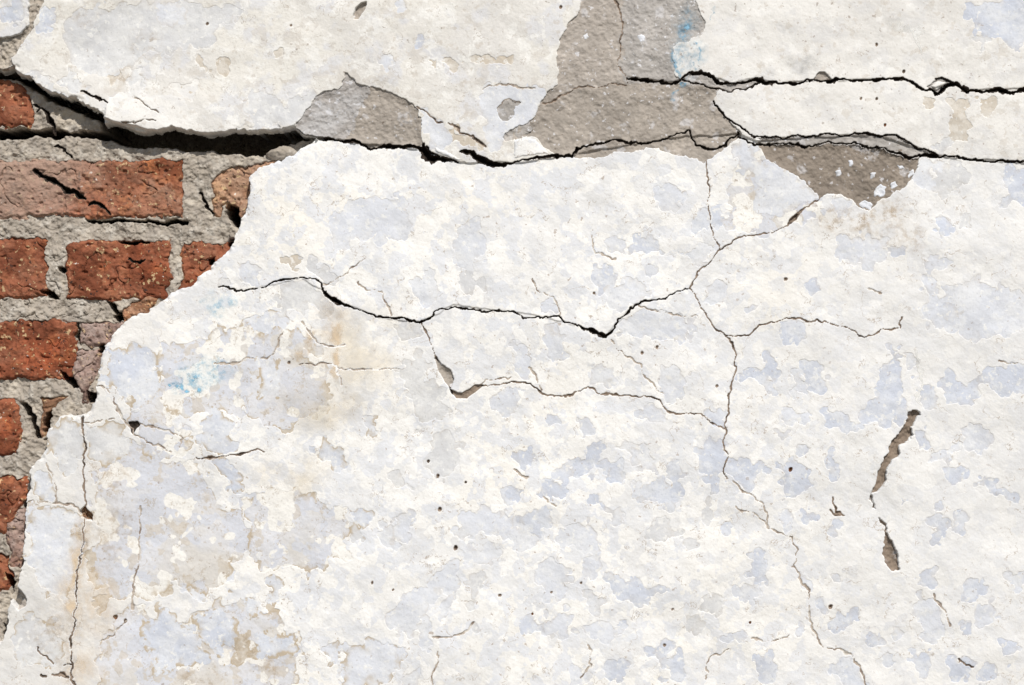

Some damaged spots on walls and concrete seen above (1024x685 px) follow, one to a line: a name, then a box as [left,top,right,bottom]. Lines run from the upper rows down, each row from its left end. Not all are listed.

crack [80,90,159,124]
peeling [22,191,416,685]
crack [214,0,1024,685]
flaking render [242,0,997,239]